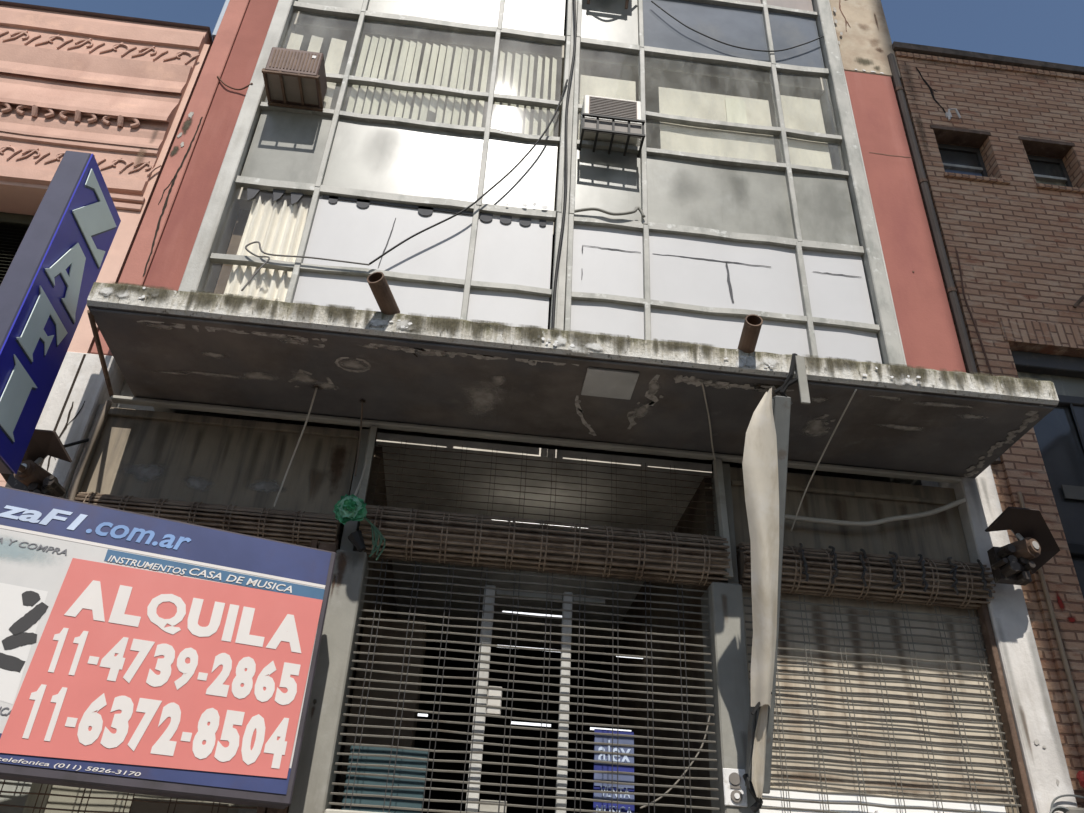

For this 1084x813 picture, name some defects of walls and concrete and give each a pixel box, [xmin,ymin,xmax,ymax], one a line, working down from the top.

crack [916,67,946,113]
crack [143,117,203,277]
water stain [297,302,312,316]
water stain [328,305,371,324]
water stain [409,314,459,332]
water stain [472,321,507,336]
water stain [521,326,630,349]
water stain [654,339,712,359]
peeling [575,395,597,436]